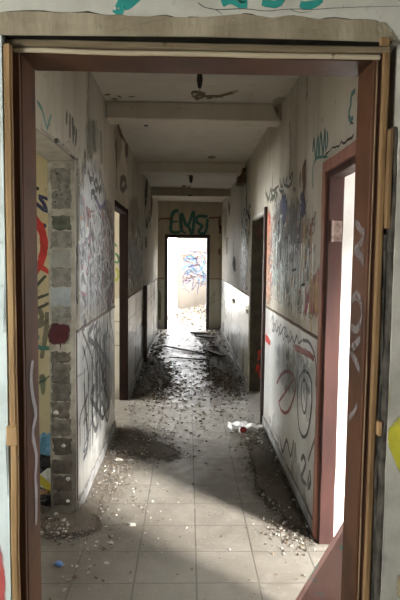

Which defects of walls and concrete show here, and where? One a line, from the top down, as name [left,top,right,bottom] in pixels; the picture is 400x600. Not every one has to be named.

flaking render [41,122,81,516]